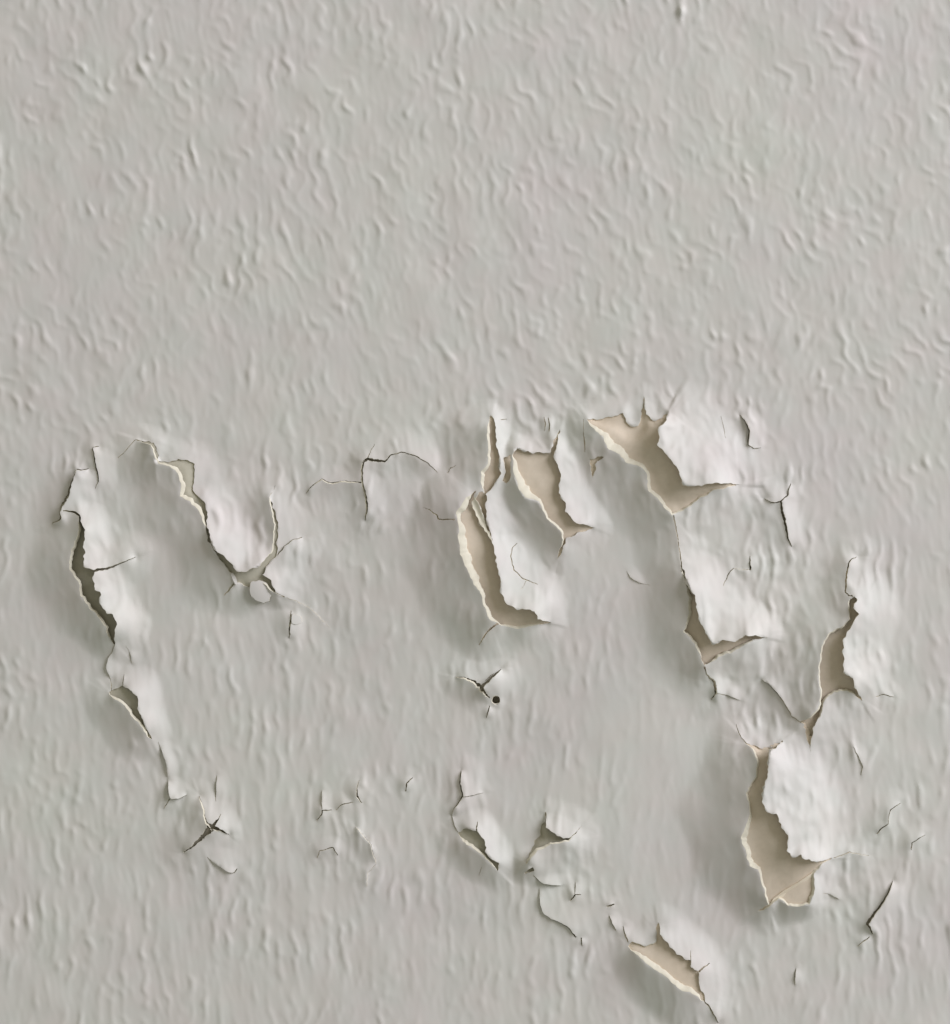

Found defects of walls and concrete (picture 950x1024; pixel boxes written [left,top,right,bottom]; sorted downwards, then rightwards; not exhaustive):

crack [300,438,461,527]
peeling [47,431,335,815]
crack [449,663,507,724]
peeling [417,375,900,923]
peeling [446,764,598,952]
crack [851,797,931,953]